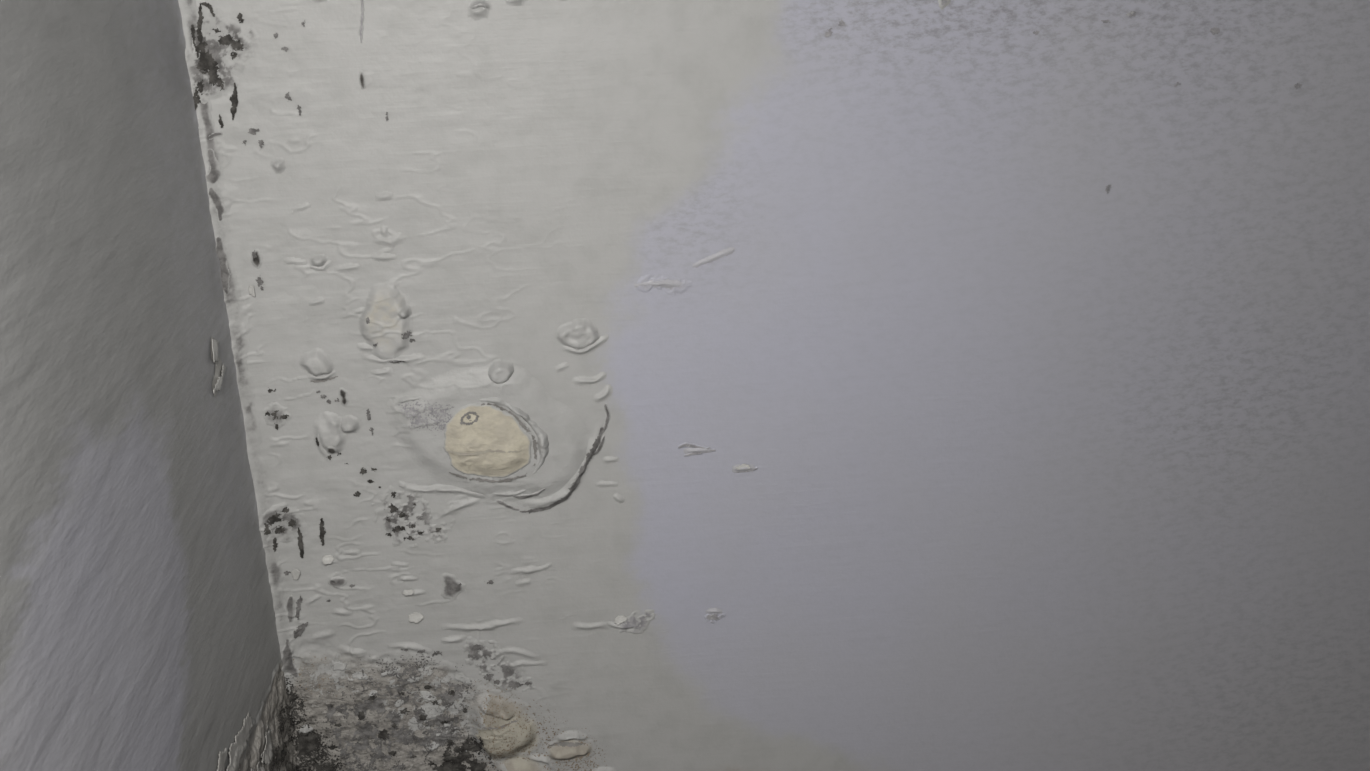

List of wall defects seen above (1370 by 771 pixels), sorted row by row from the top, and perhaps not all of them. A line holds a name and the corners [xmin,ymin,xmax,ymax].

damp [0,0,927,771]